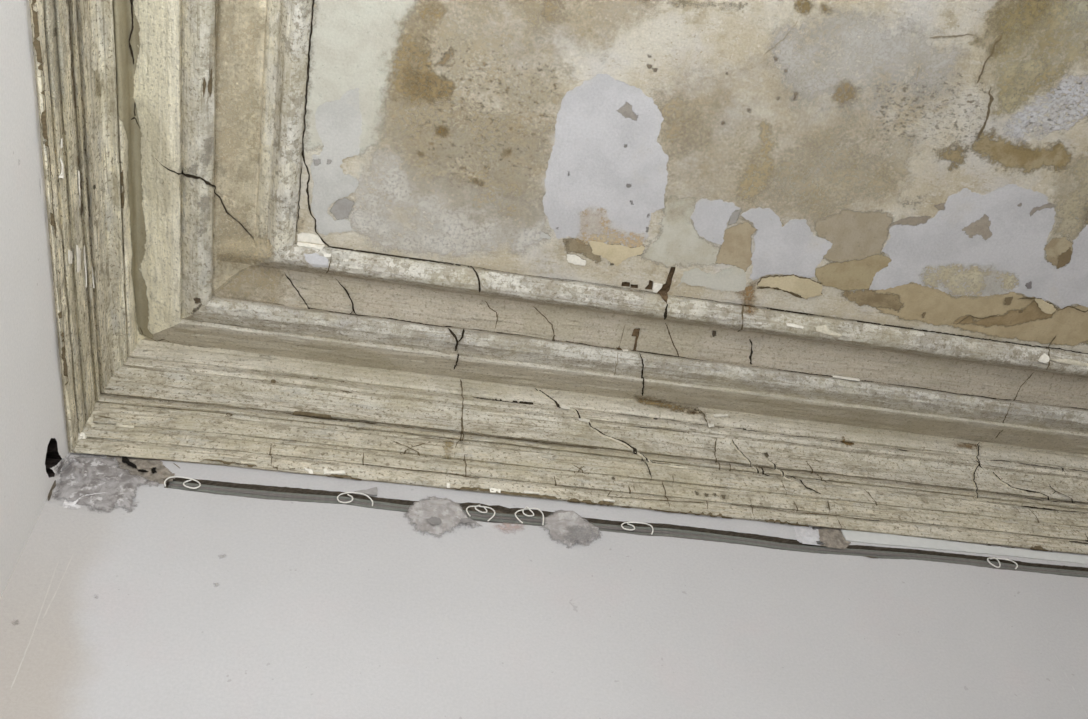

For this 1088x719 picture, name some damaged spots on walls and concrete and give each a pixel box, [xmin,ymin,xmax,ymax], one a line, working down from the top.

water stain [771,0,961,103]
water stain [988,0,1088,115]
crack [156,159,255,243]
water stain [302,0,562,256]
peeling [407,37,669,266]
water stain [582,196,720,268]
peeling [653,283,668,303]
crack [241,0,1088,529]
peeling [678,198,832,299]
peeling [786,323,842,337]
water stain [738,121,1088,346]
peeling [869,184,1088,314]